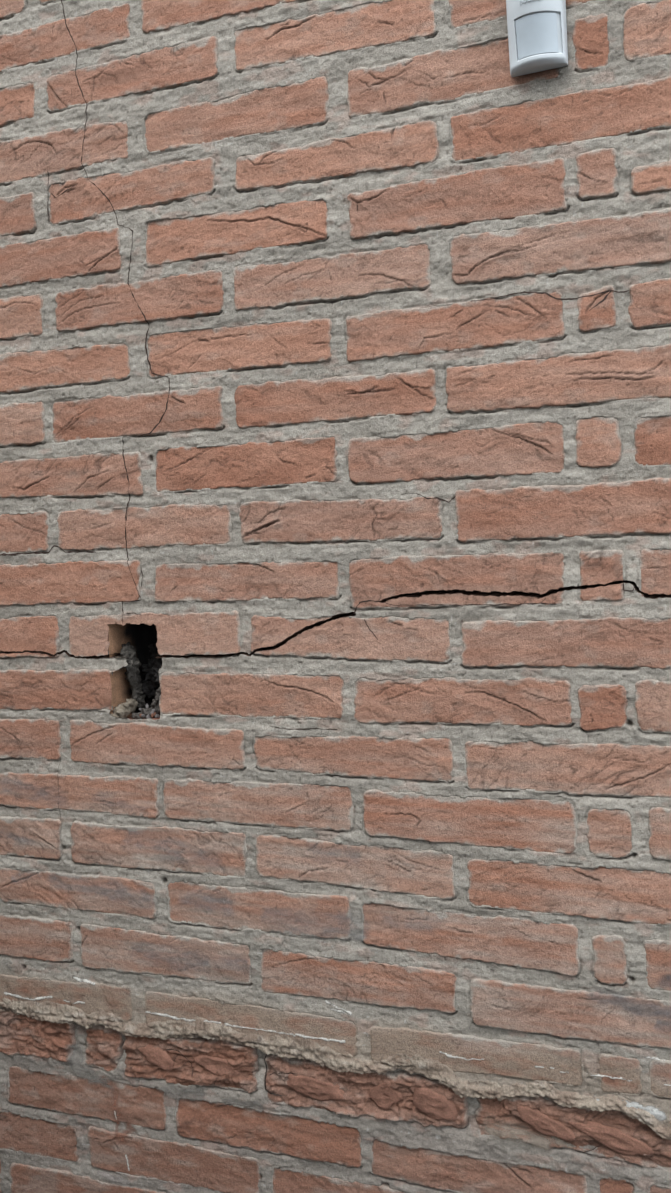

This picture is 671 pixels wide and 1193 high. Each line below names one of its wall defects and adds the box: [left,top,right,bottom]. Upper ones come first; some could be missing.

crack [47,0,170,625]
crack [0,650,120,659]
crack [155,580,671,659]
spalling [0,998,671,1168]